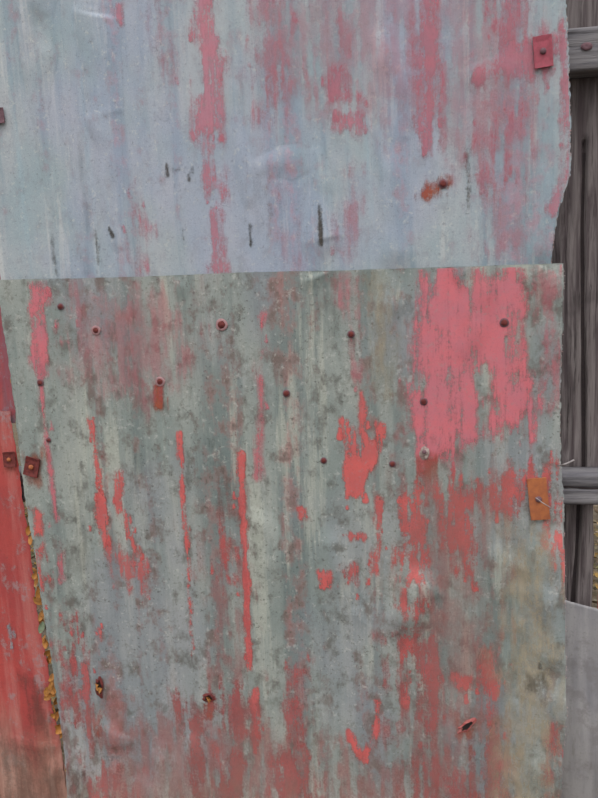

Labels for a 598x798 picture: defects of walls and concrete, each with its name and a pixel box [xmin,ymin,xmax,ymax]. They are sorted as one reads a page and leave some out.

rust [421,177,452,201]
rust [153,385,168,410]
peeling [336,267,565,798]
peeling [317,570,332,590]